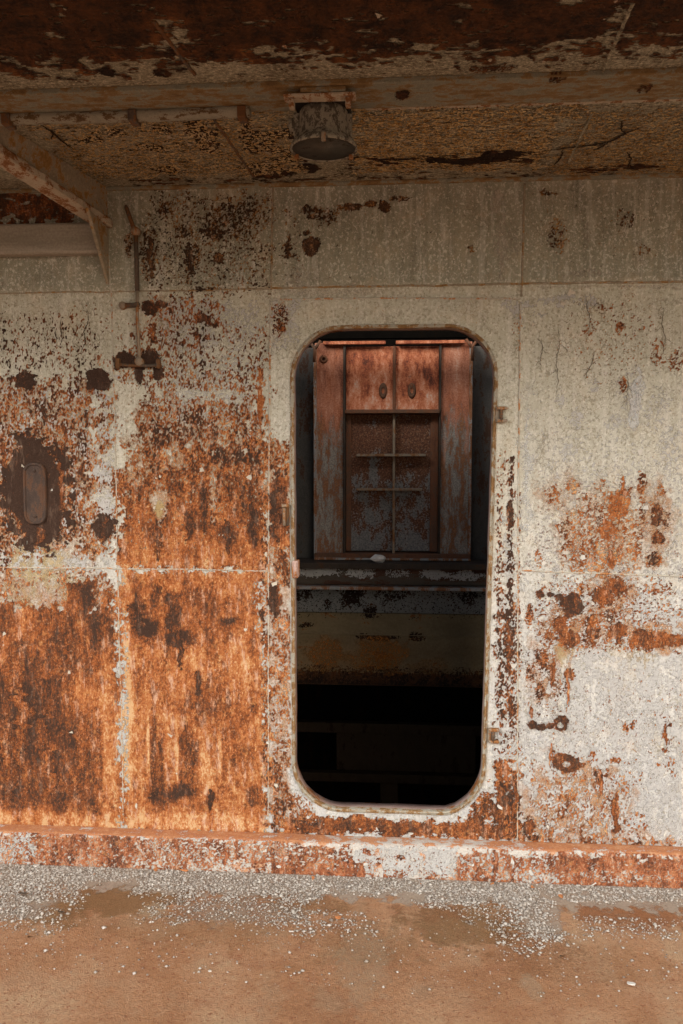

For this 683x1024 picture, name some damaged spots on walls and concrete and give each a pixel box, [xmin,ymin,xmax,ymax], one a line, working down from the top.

corrosion [0,84,683,889]
crack [430,121,642,167]